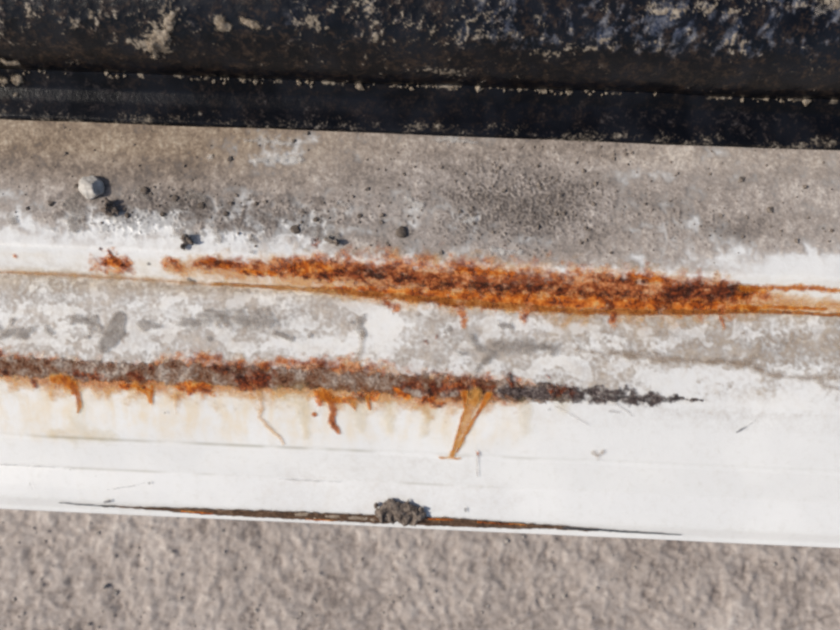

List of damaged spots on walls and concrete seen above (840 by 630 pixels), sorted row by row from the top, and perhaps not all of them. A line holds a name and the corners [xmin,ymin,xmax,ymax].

rust [90,247,133,278]
rust [161,238,840,328]
rust [0,350,56,388]
rust [49,356,163,413]
rust [174,381,211,395]
rust [176,352,385,391]
rust [312,388,380,434]
rust [392,372,496,460]